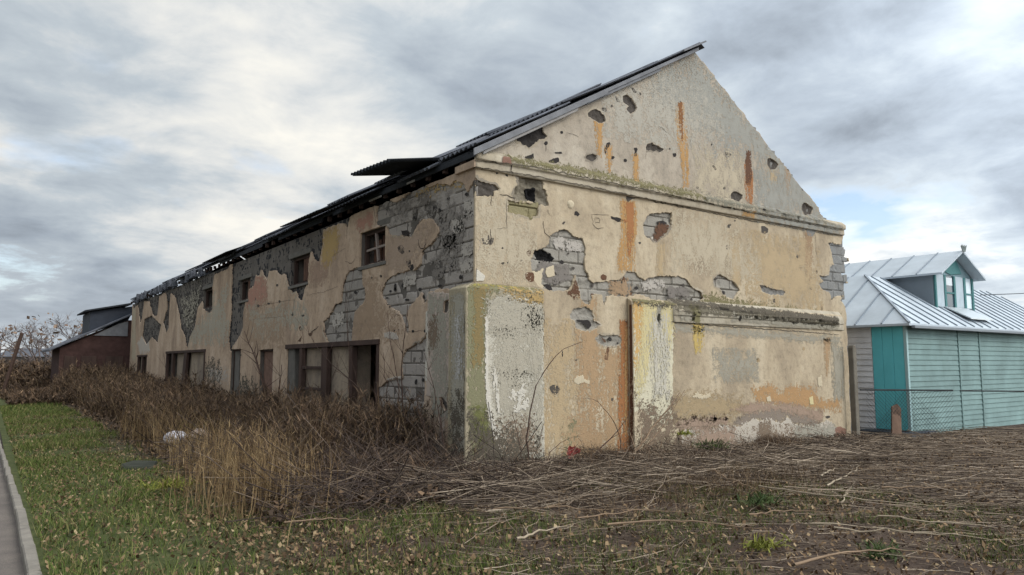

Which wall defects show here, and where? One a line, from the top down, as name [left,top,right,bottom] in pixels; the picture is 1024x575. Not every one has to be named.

spalling [133,218,350,355]
spalling [291,156,548,446]
damp [332,180,582,470]
spalling [515,128,563,163]
corrosion [594,121,613,171]
corrosion [559,198,675,462]
corrosion [675,102,690,188]
spalling [521,211,847,454]
damp [601,53,845,452]
corrosion [742,150,756,219]